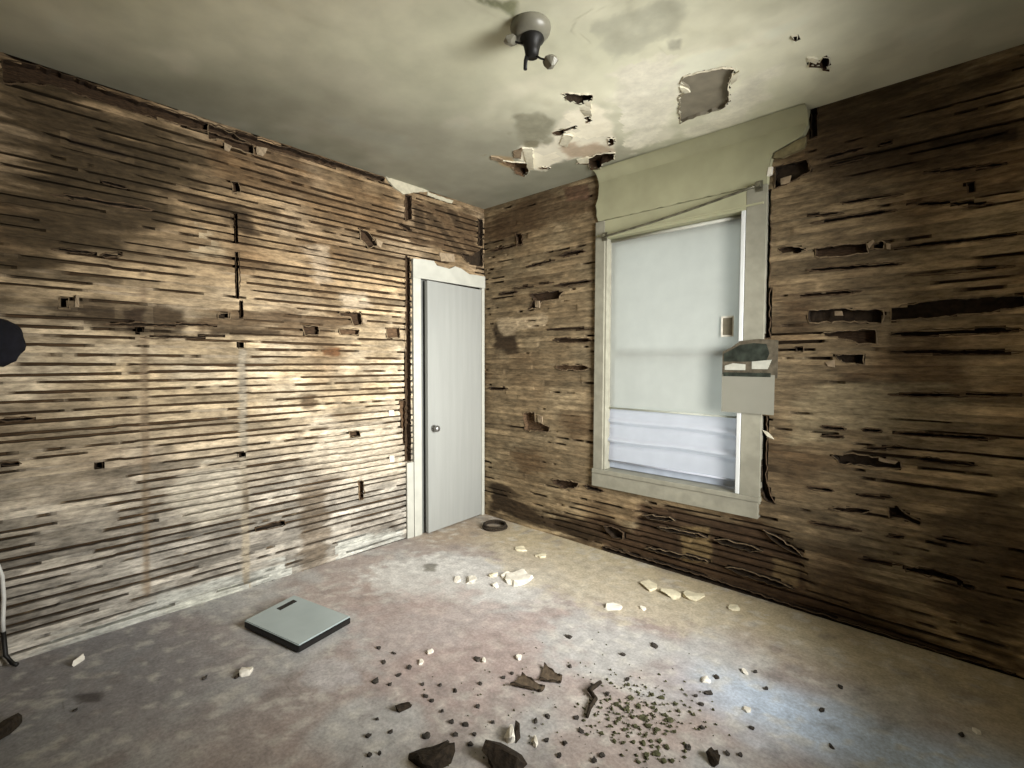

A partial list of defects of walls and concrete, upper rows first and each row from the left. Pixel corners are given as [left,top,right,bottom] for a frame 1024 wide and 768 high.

damp [492,96,581,156]
peeling [491,28,739,174]
peeling [427,192,453,204]
spalling [767,158,812,189]